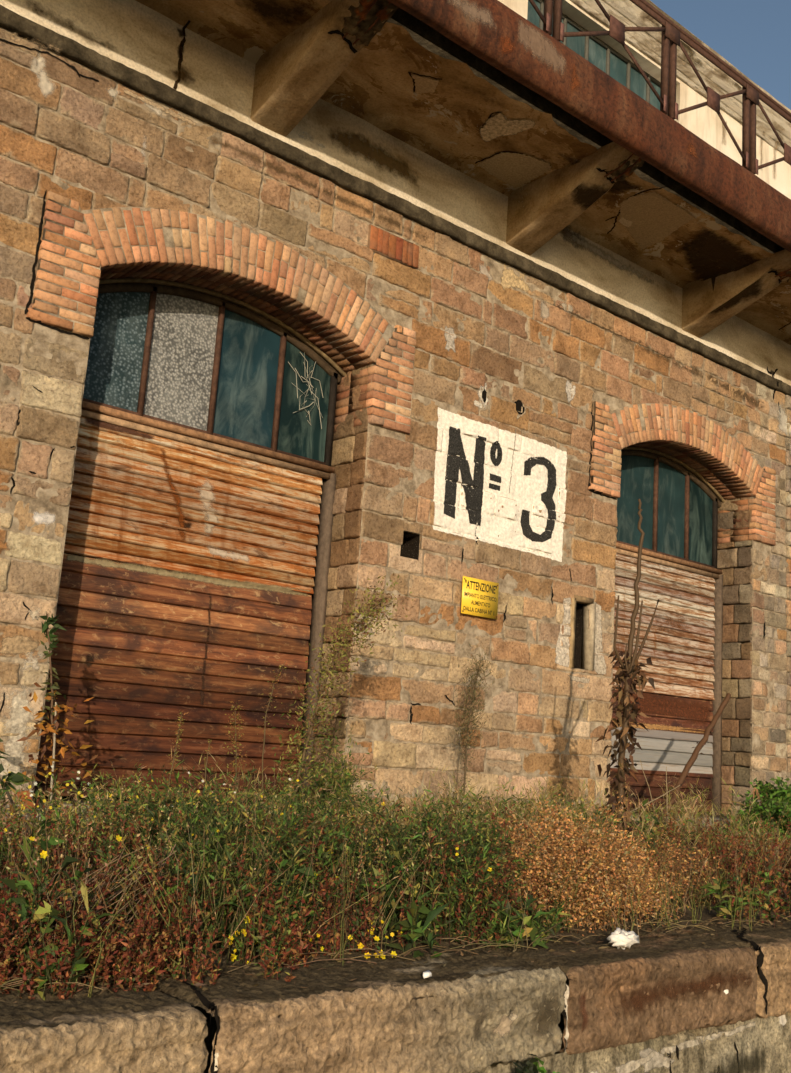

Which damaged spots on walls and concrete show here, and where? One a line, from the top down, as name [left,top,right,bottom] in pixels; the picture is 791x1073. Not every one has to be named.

water stain [28,1,110,49]
spalling [328,0,399,54]
rust [453,0,493,25]
crack [0,38,99,81]
rust [501,21,580,91]
peeling [479,112,535,142]
water stain [302,131,417,183]
peeling [475,151,552,202]
water stain [681,230,760,291]
water stain [708,278,761,314]
crack [732,928,768,1015]
crack [172,976,220,1073]